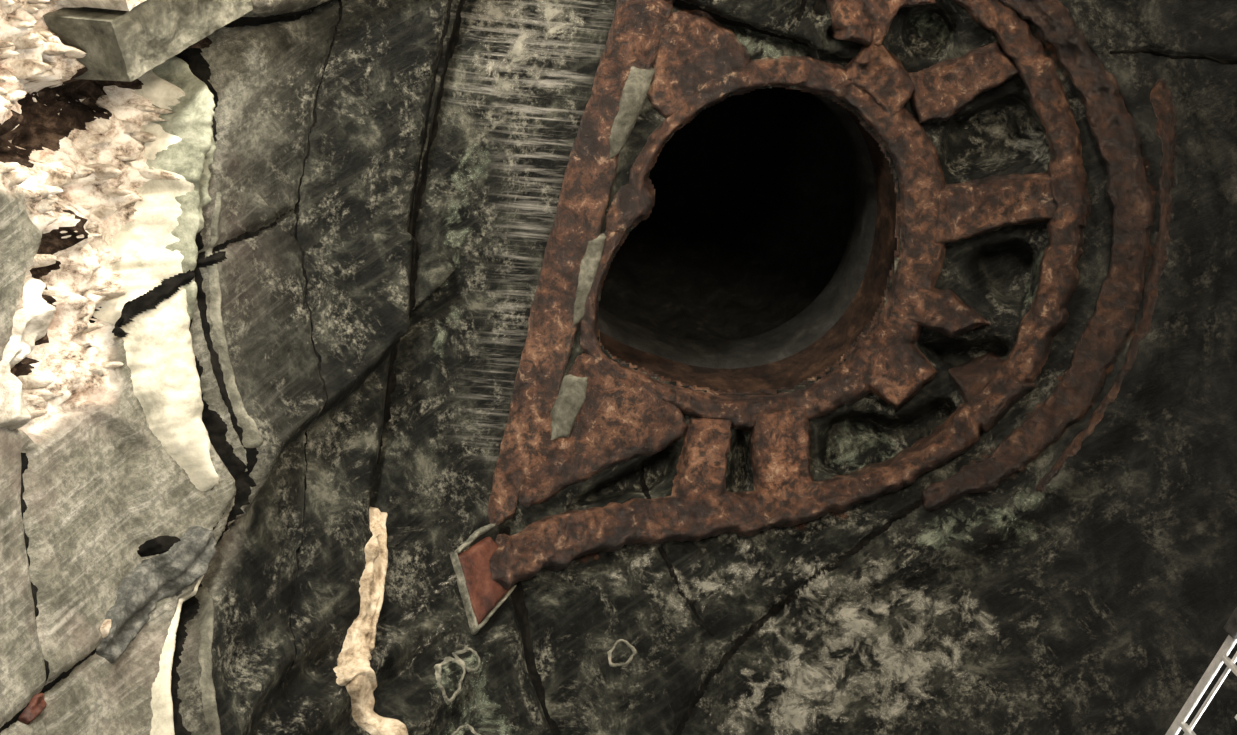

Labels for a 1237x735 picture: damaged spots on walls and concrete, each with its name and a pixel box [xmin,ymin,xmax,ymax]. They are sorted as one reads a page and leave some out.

crack [175,48,219,143]
spalling [188,37,212,49]
crack [673,0,827,47]
crack [1109,48,1237,65]
spalling [0,0,179,430]
crack [374,0,465,474]
crack [189,0,343,674]
crack [640,465,652,499]
crack [499,526,511,536]
crack [0,648,96,733]
crack [171,581,203,735]
crack [511,581,561,735]